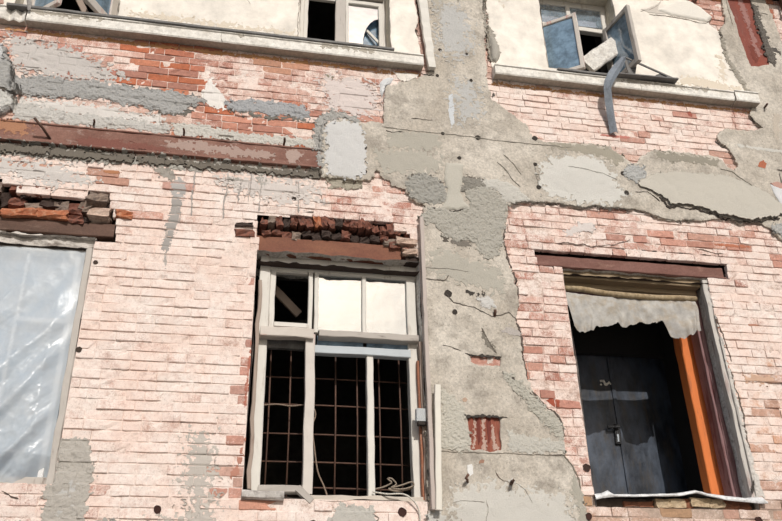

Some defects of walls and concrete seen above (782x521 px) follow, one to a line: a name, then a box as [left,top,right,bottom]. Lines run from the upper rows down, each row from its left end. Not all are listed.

spalling [479,0,502,63]
flaking render [641,0,712,22]
spalling [751,2,781,67]
spalling [405,172,511,260]
crack [426,229,581,501]